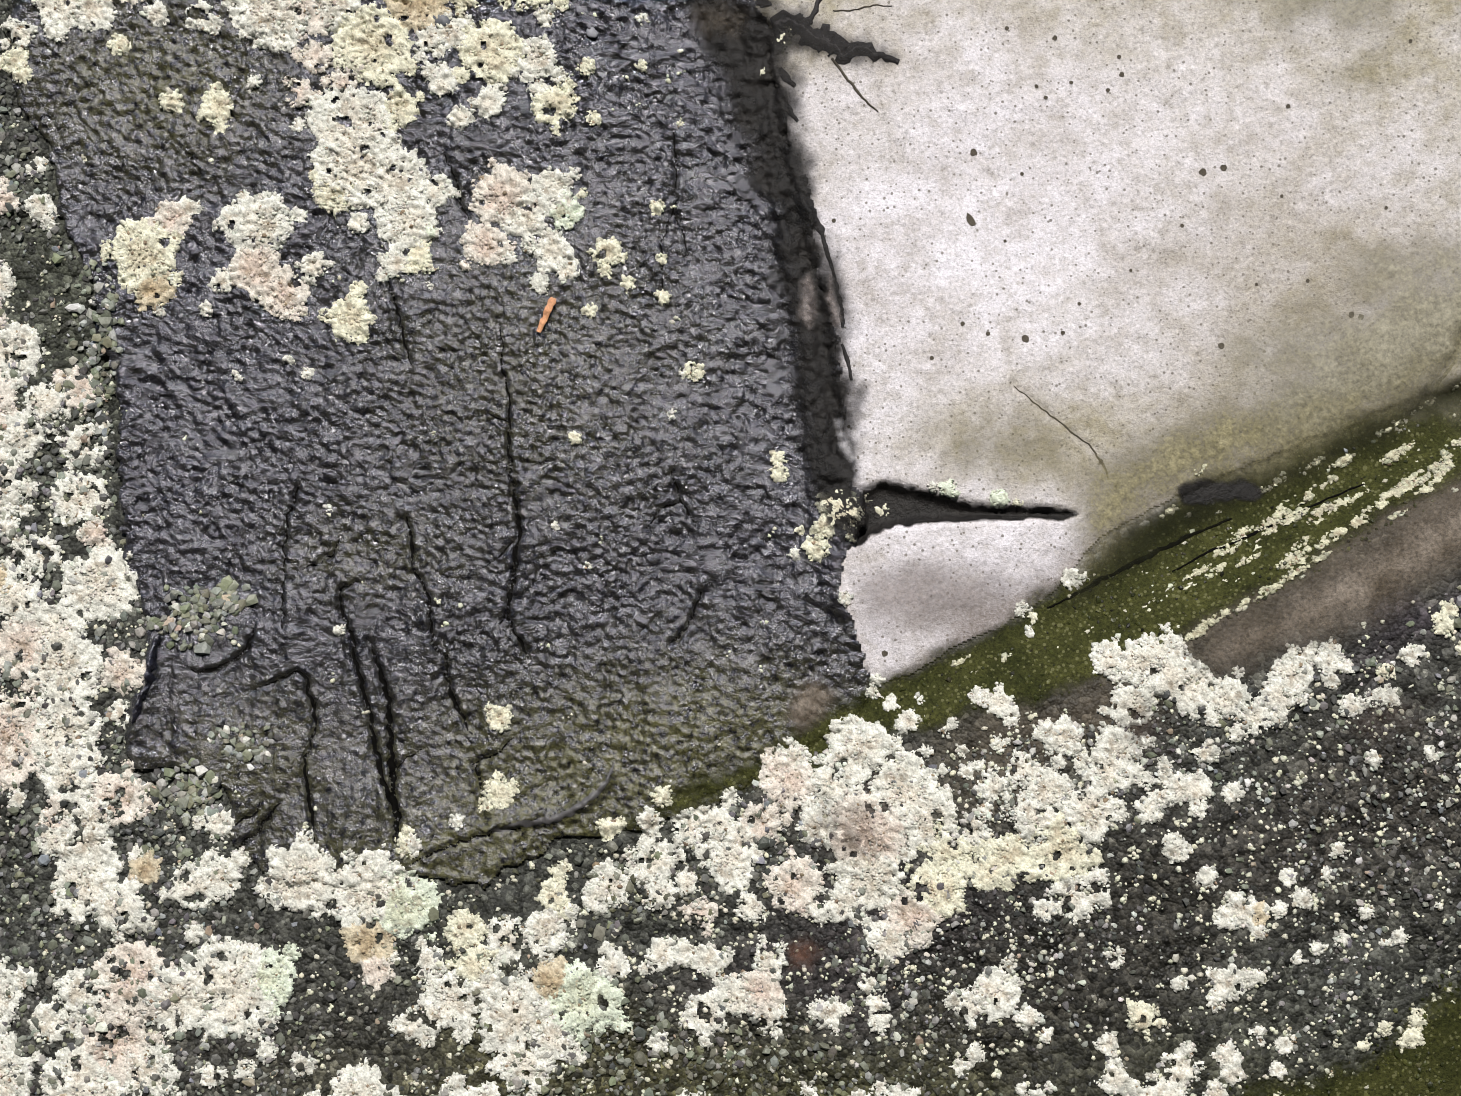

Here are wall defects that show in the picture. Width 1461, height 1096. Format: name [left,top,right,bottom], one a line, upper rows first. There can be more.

crack [475,327,529,658]
crack [854,480,1078,545]
crack [1047,483,1365,609]
water stain [1178,478,1262,504]
water stain [1209,500,1461,662]
crack [191,482,521,866]